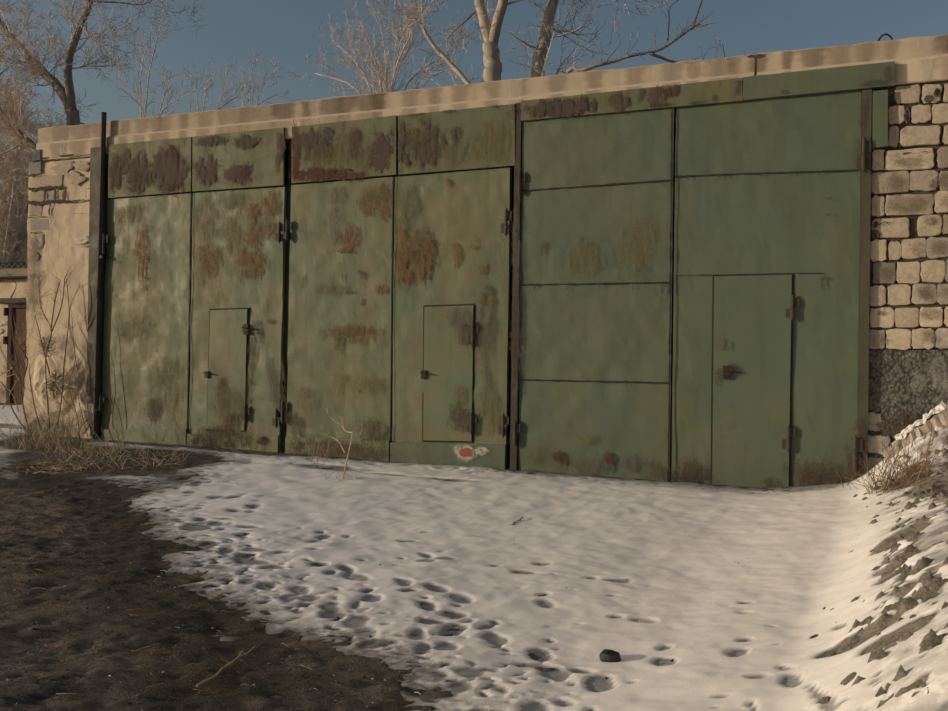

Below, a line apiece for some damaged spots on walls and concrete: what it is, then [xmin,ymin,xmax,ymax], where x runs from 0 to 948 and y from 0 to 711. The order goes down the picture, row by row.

corrosion [508,85,678,119]
spalling [41,154,90,186]
corrosion [275,121,394,183]
corrosion [107,133,260,292]
corrosion [266,361,399,460]